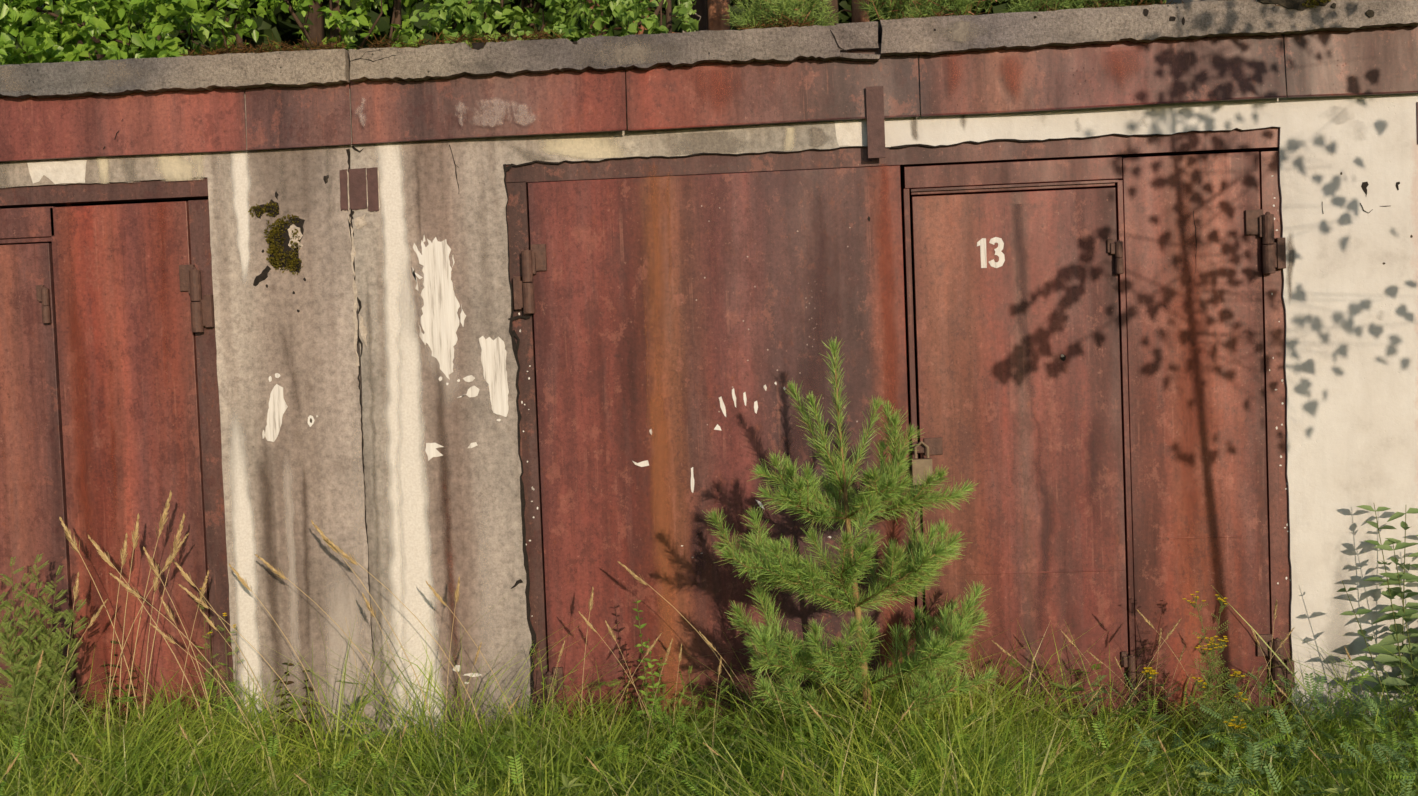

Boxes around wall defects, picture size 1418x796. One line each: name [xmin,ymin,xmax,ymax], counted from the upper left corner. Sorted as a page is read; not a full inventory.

damp [231,424,308,735]
peeling [262,373,288,442]
damp [328,585,363,746]
crack [346,145,377,739]
damp [367,142,450,745]
peeling [411,236,509,421]